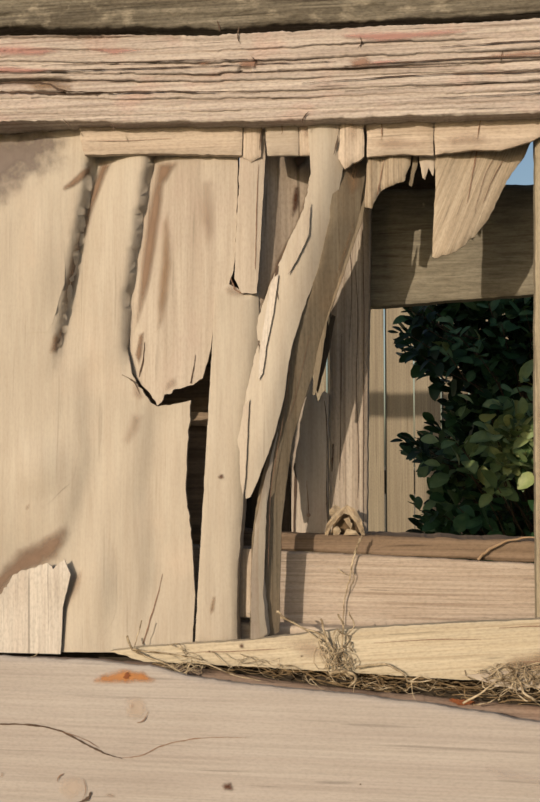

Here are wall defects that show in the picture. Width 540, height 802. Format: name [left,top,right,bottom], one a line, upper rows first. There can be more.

peeling [258,274,279,380]
peeling [239,400,249,494]
rust [100,671,149,682]
crack [0,723,244,759]